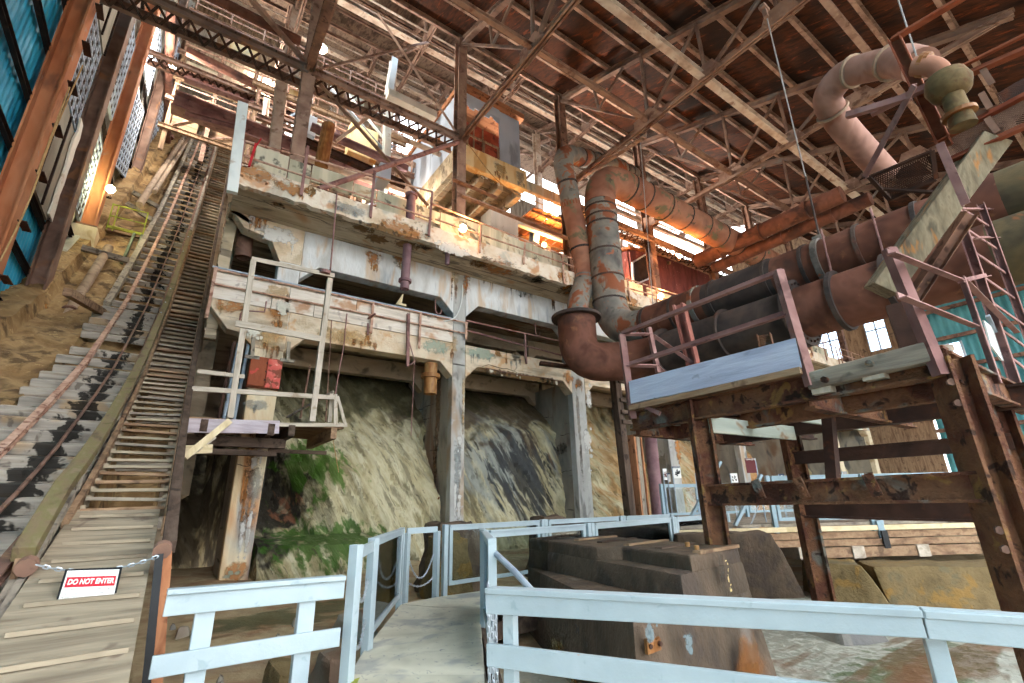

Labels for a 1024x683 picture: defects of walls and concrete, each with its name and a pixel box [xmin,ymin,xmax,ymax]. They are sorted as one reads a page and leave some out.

corrosion [240,166,306,200]
corrosion [366,251,402,271]
corrosion [216,299,243,313]
corrosion [270,295,290,328]
corrosion [551,272,572,310]